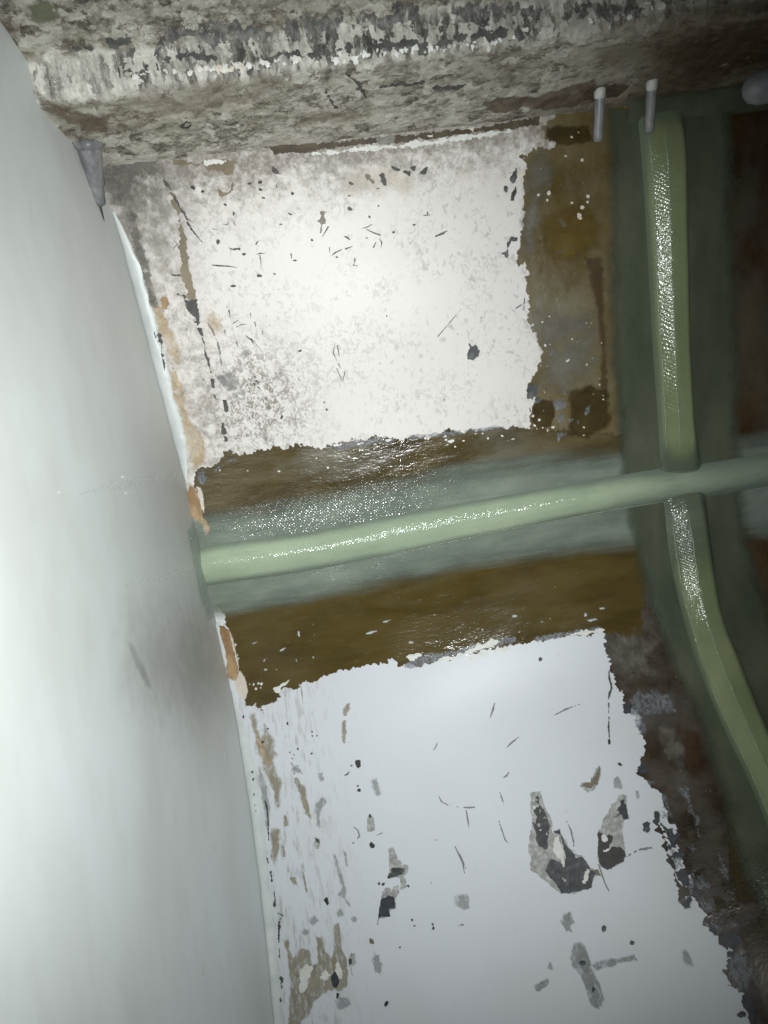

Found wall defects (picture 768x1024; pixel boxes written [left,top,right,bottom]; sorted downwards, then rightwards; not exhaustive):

leakage [30,1,59,23]
leakage [38,94,107,132]
leakage [484,79,597,113]
leakage [128,213,204,468]
peeling [223,533,768,1024]